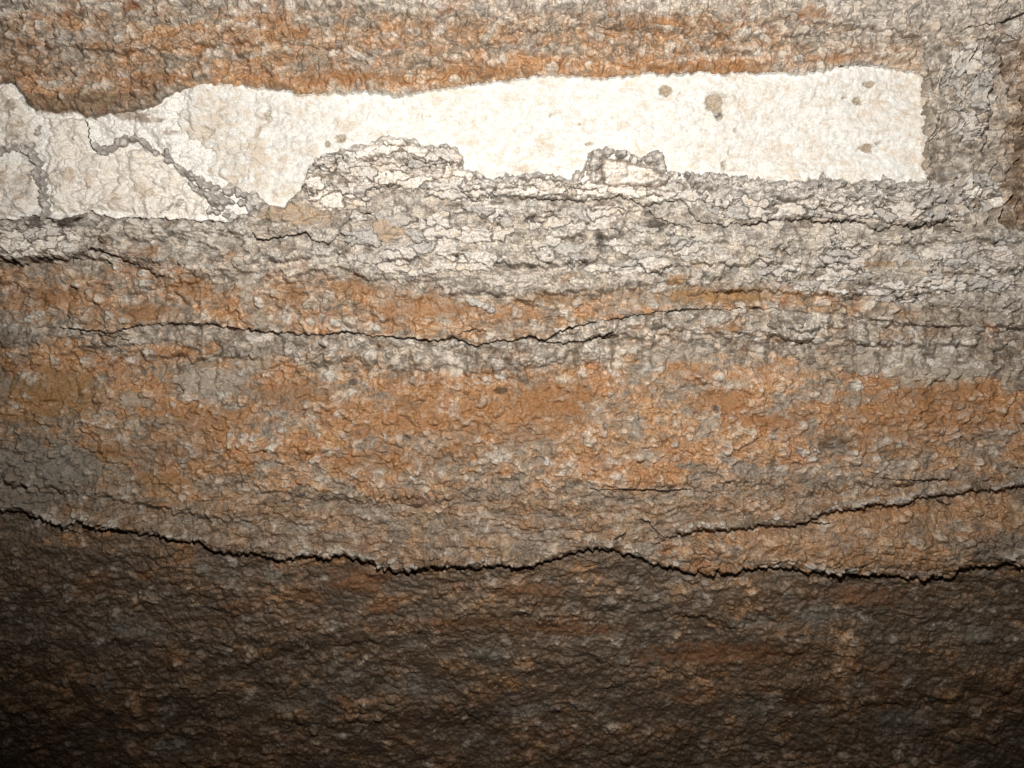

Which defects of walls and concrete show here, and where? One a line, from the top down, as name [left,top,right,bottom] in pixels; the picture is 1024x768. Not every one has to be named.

spalling [0,61,1005,281]
crack [59,307,740,347]
crack [1,477,1024,587]